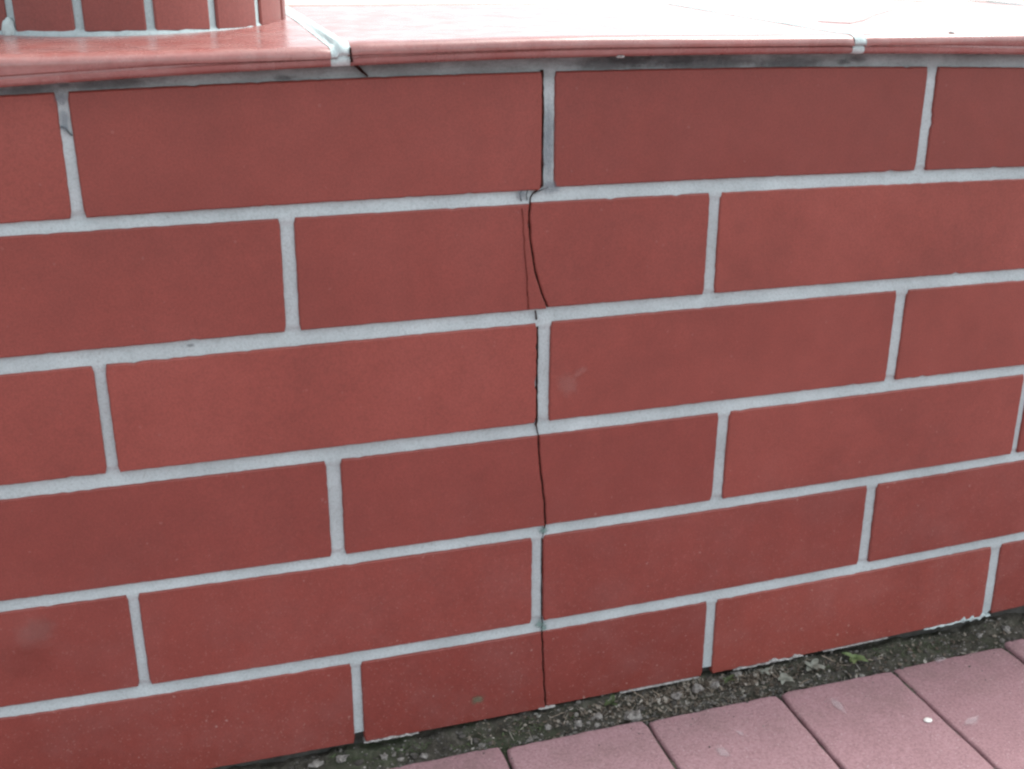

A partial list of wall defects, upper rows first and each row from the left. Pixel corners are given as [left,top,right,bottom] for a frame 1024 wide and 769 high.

crack [520,70,549,710]